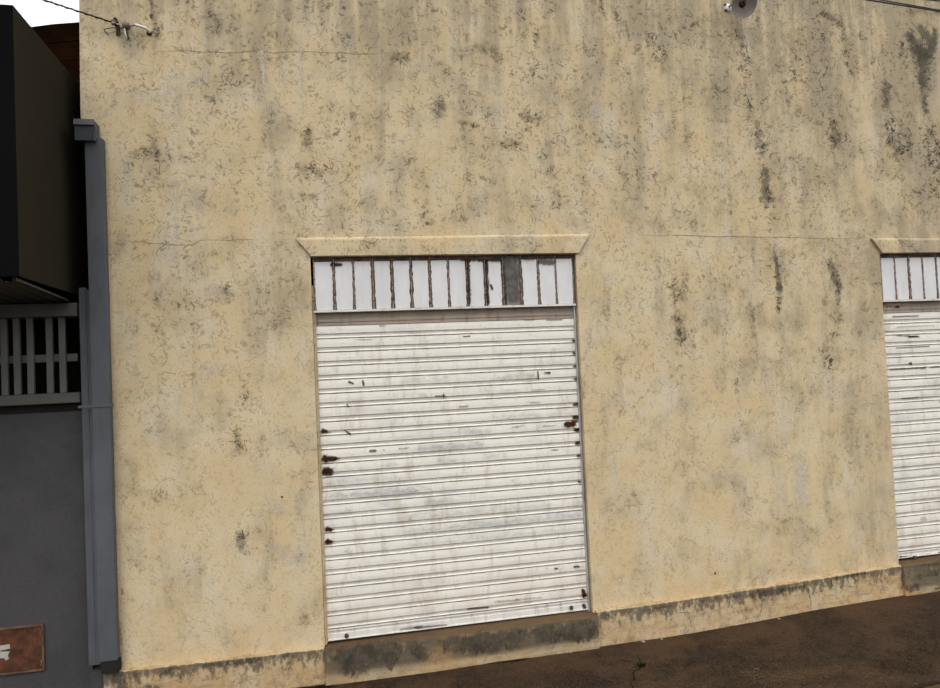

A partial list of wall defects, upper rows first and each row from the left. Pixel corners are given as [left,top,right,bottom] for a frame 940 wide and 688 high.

water stain [901,25,937,113]
water stain [760,167,771,201]
water stain [774,254,782,311]
rust [564,403,580,457]
rust [321,454,340,476]
water stain [727,585,806,599]
water stain [324,640,429,676]
water stain [438,631,519,655]
water stain [533,621,599,643]